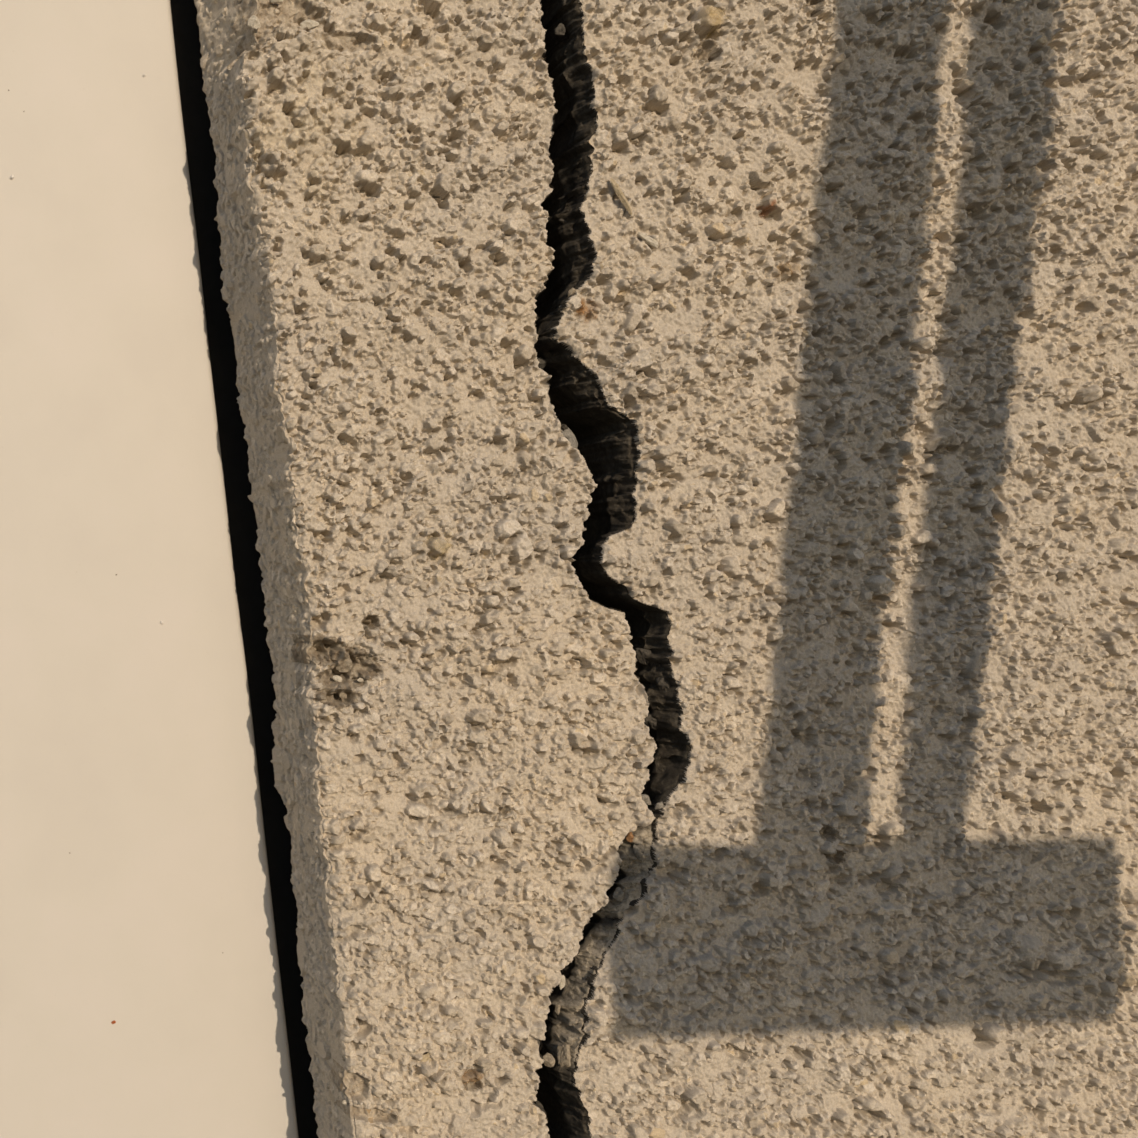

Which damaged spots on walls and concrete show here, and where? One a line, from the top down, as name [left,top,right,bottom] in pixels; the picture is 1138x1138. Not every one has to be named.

crack [533,0,691,1138]